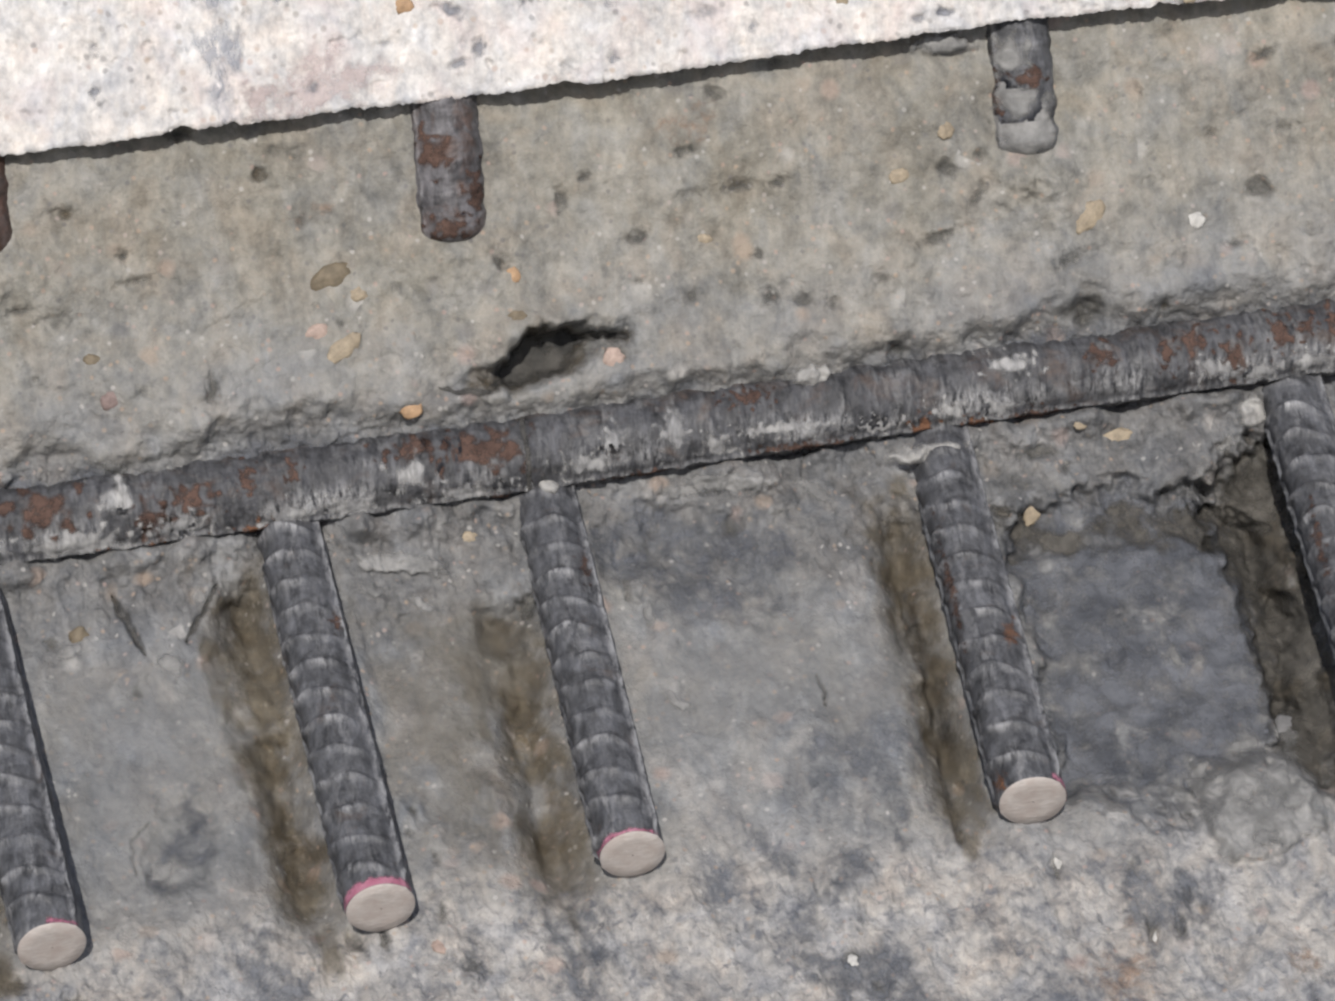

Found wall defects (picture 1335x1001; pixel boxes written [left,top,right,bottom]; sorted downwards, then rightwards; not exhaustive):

corrosion [992,64,1049,116]
corrosion [413,121,485,241]
spalling [439,327,629,396]
corrosion [1083,337,1119,373]
corrosion [1157,298,1335,383]
corrosion [712,383,778,412]
corrosion [959,402,1077,426]
corrosion [375,427,526,479]
corrosion [0,482,84,543]
corrosion [126,456,258,546]
spalling [995,435,1335,864]
spalling [148,801,209,892]